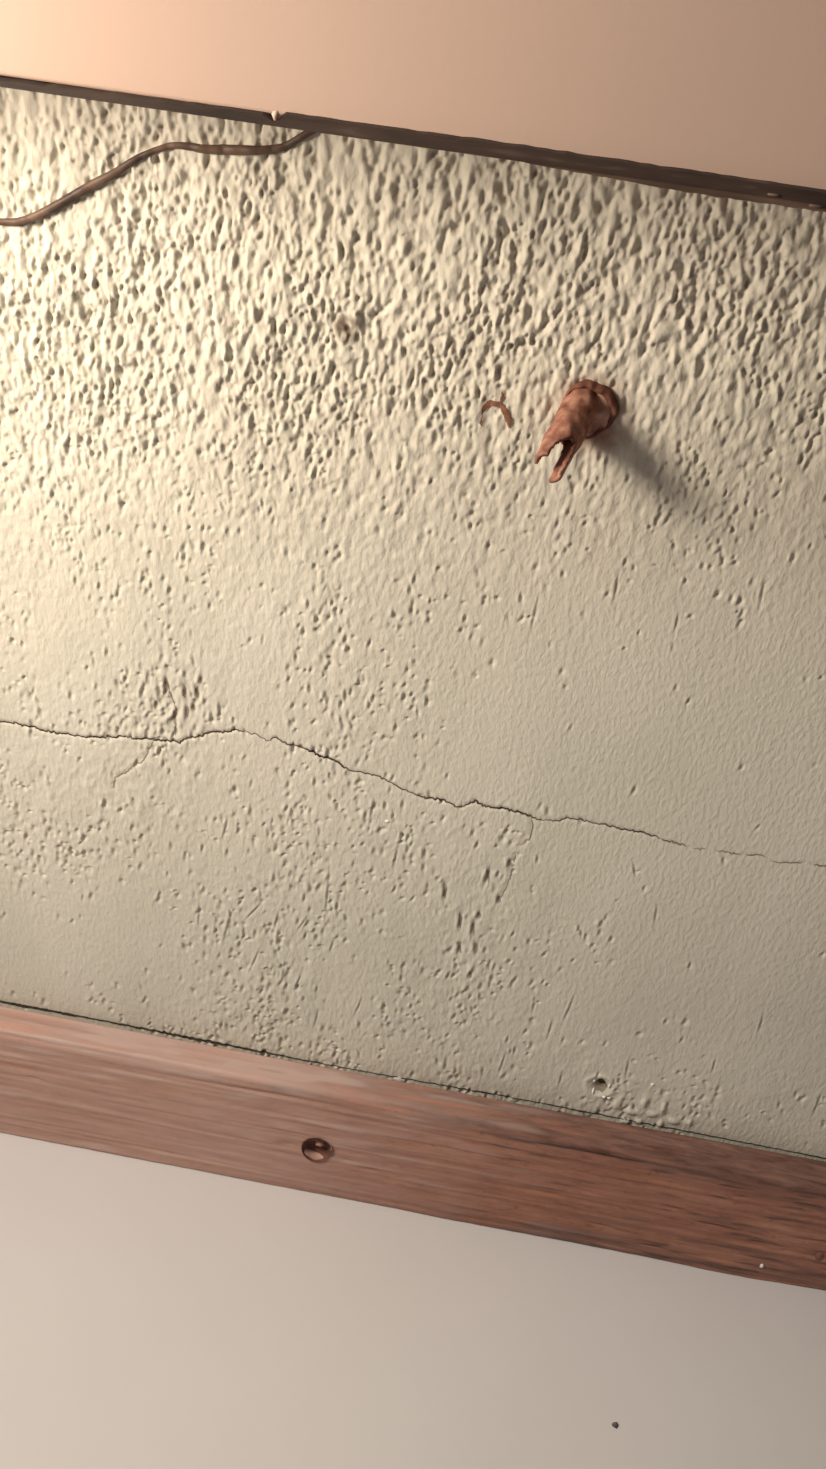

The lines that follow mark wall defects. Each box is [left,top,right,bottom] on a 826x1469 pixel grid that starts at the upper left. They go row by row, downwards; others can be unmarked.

rust [479,391,511,428]
crack [0,681,826,898]